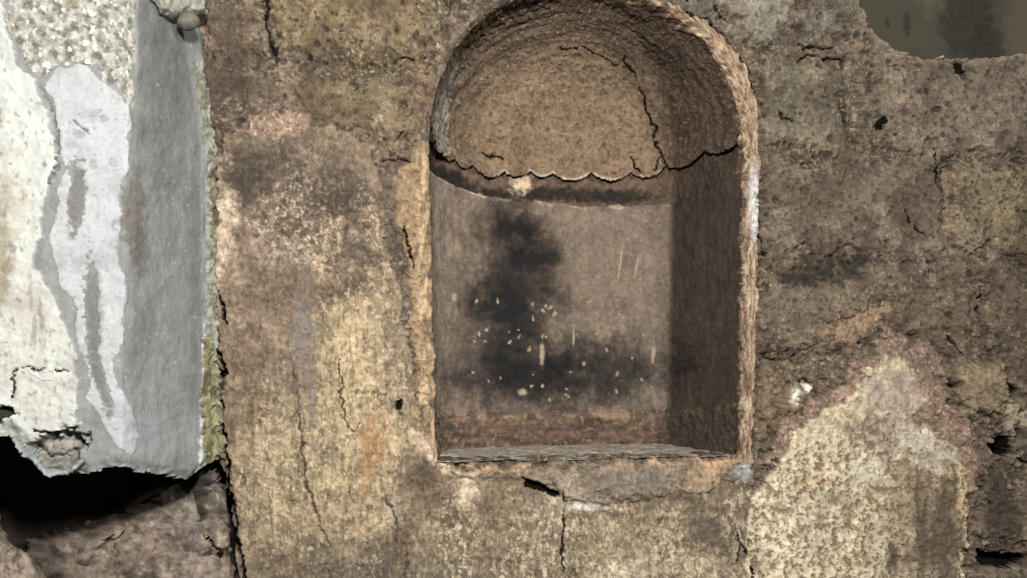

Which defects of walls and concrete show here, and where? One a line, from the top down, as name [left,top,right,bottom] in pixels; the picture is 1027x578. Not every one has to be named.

flaking render [0,0,139,478]
crack [204,298,247,578]
water stain [483,189,509,199]
water stain [502,213,539,242]
crack [558,493,566,571]
flaking render [212,109,978,578]